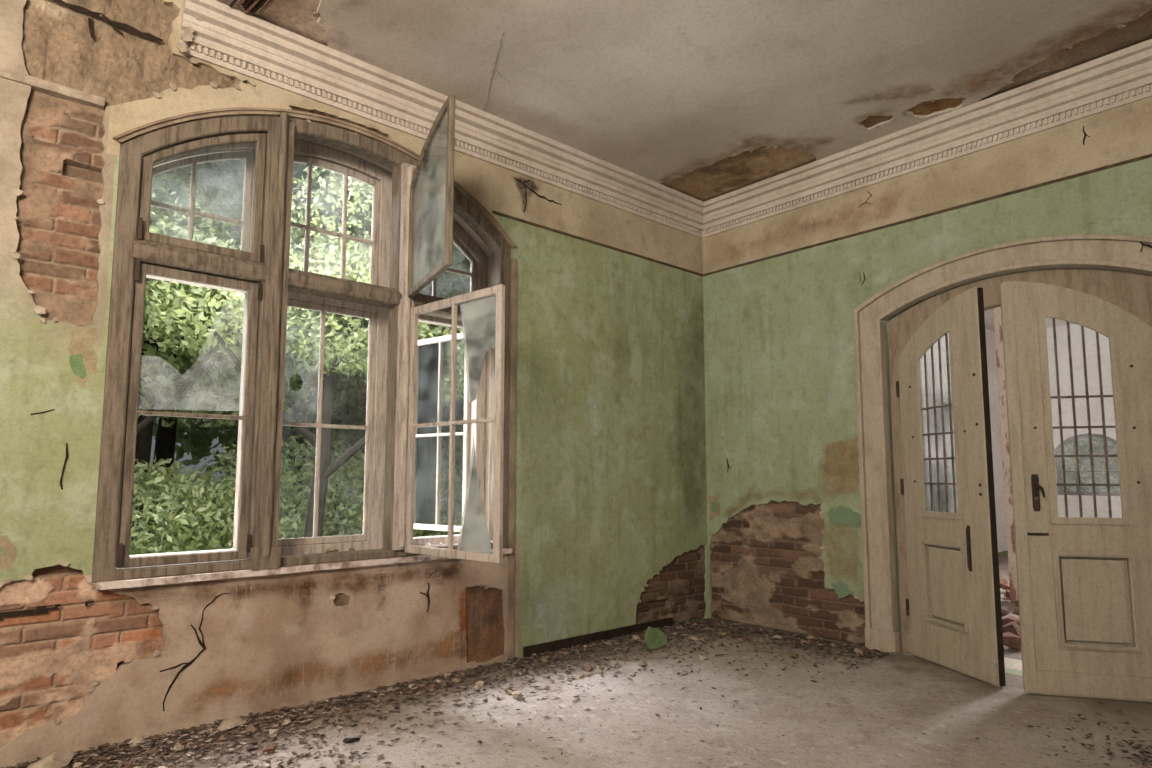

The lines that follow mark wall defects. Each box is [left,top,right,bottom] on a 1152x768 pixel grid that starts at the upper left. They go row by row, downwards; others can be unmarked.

crack [53,0,163,41]
spalling [216,0,329,46]
spalling [980,9,1152,101]
flaking render [290,107,388,143]
spalling [859,98,964,128]
flaking render [11,0,256,388]
spalling [660,146,816,202]
flaking render [636,437,866,645]
flaking render [0,535,163,748]
crack [160,593,228,711]
flaking render [465,584,507,664]